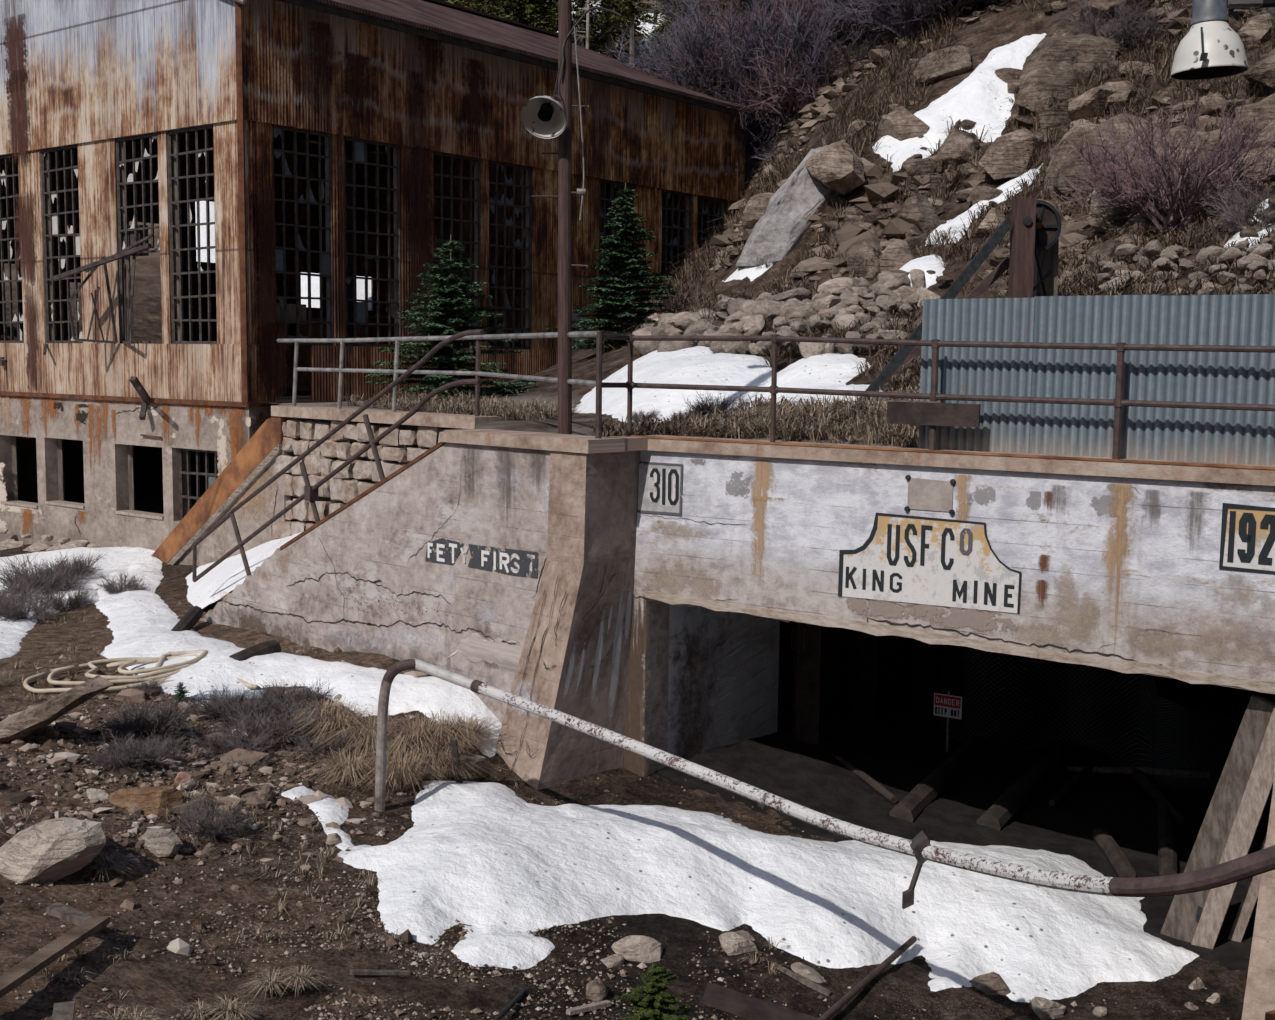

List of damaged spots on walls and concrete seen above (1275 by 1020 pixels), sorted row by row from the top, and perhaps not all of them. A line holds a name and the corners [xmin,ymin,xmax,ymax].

rust [3,13,30,164]
rust [0,192,142,463]
spalling [53,402,89,424]
rust [162,403,264,461]
peeling [208,415,228,475]
peeling [0,462,43,528]
rust [752,460,783,571]
peeling [968,486,995,505]
peeling [1026,491,1041,509]
rust [1036,555,1050,603]
rust [1104,484,1133,636]
crack [221,469,1182,768]